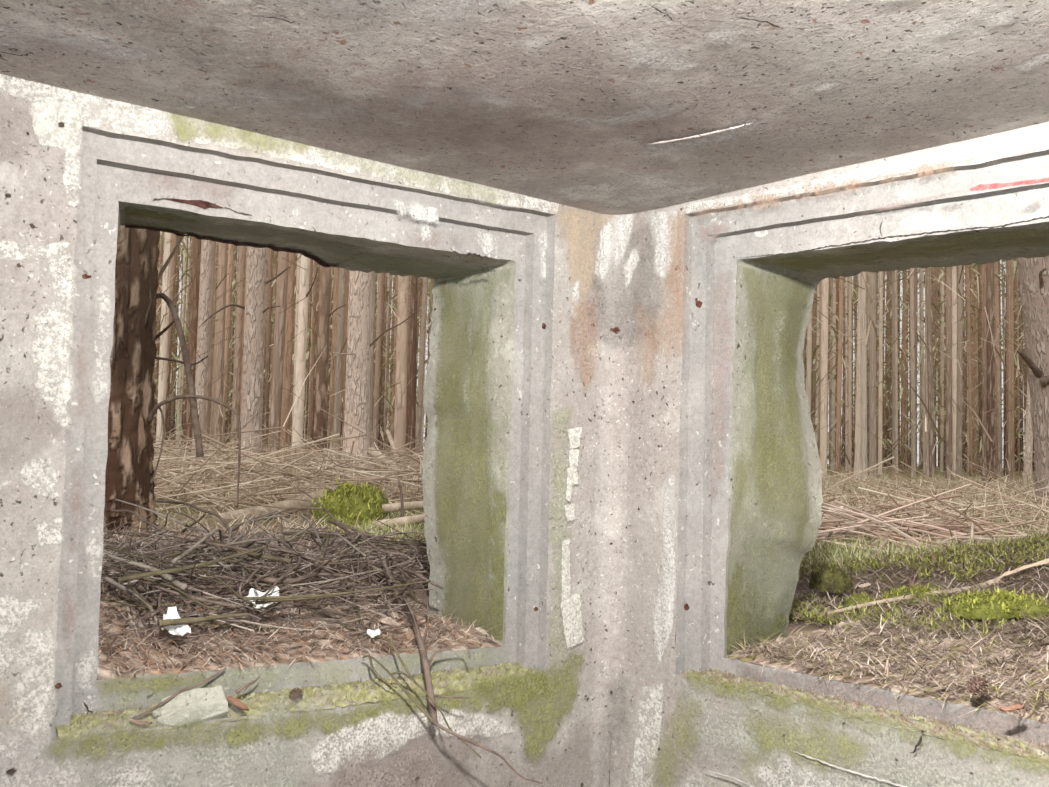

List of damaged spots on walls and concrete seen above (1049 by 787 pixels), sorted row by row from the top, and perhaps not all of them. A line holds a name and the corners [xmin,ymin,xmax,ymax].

crack [451,249,497,269]
crack [738,216,1049,258]
damp [686,689,1049,787]
damp [743,667,1049,744]